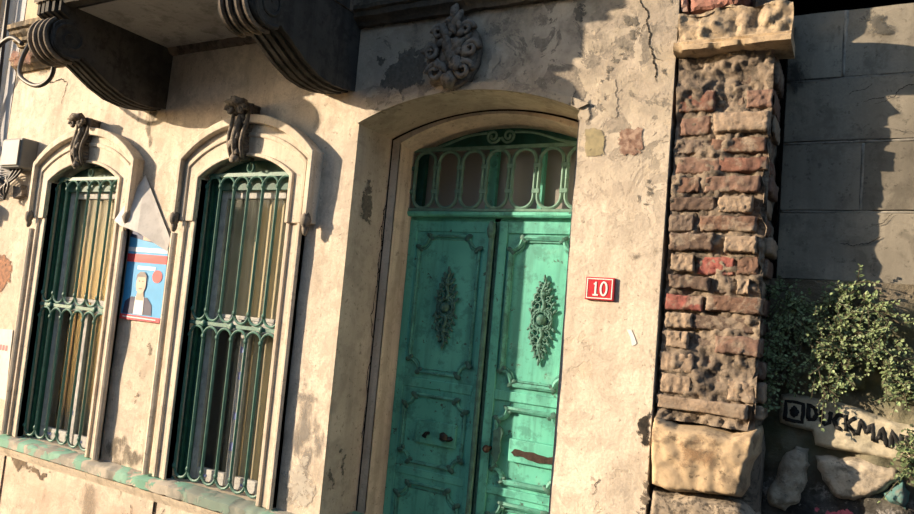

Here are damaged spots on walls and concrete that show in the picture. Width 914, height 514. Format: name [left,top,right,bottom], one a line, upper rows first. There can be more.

crack [639,0,660,81]
peeling [377,47,427,94]
spalling [0,254,12,294]
spalling [11,457,50,481]